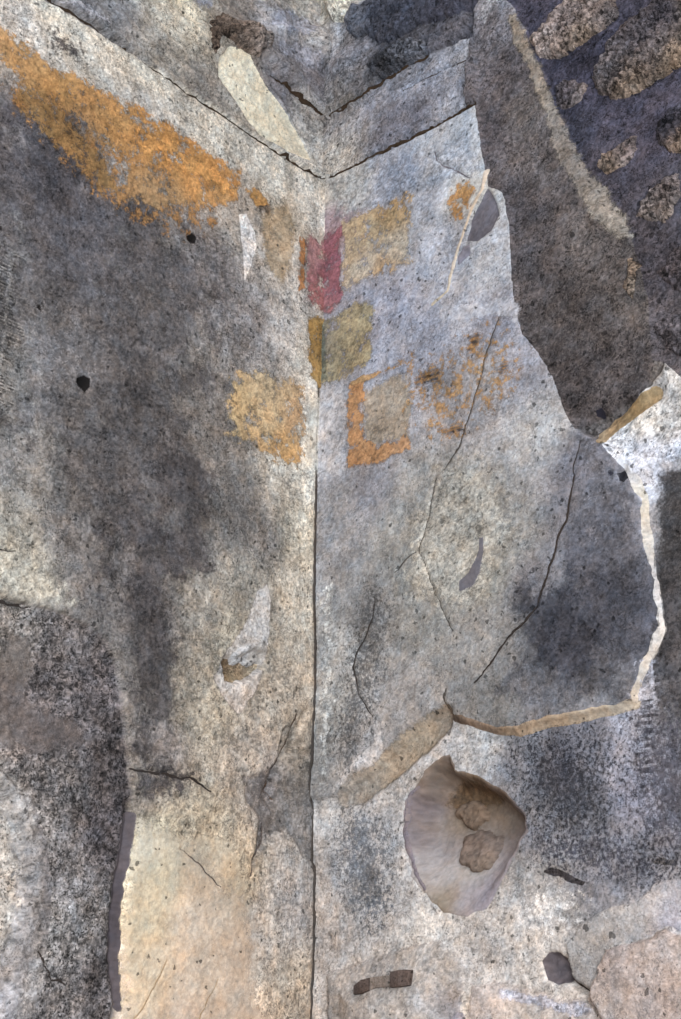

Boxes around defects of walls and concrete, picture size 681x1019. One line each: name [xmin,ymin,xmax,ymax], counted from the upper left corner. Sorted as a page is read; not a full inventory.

spalling [209,12,310,160]
damp [0,90,230,800]
flaking render [214,584,271,714]
spalling [243,713,314,863]
crack [394,315,500,631]
flaking render [337,0,681,917]
crack [474,440,582,683]
damp [494,436,681,937]